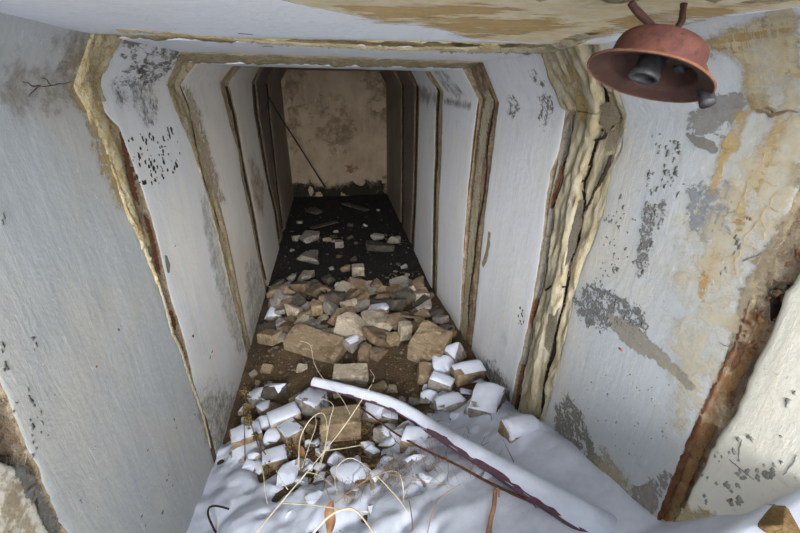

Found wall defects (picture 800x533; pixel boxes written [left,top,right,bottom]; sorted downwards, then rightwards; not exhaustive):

crack [23,77,70,97]
rust [119,132,140,205]
water stain [116,81,180,185]
rust [143,214,161,275]
peeling [528,70,554,127]
water stain [284,0,800,108]
crack [541,123,617,414]
peeling [572,92,748,393]
water stain [698,117,800,292]
spalling [730,211,800,342]
rust [657,300,778,522]
peeling [631,469,672,515]